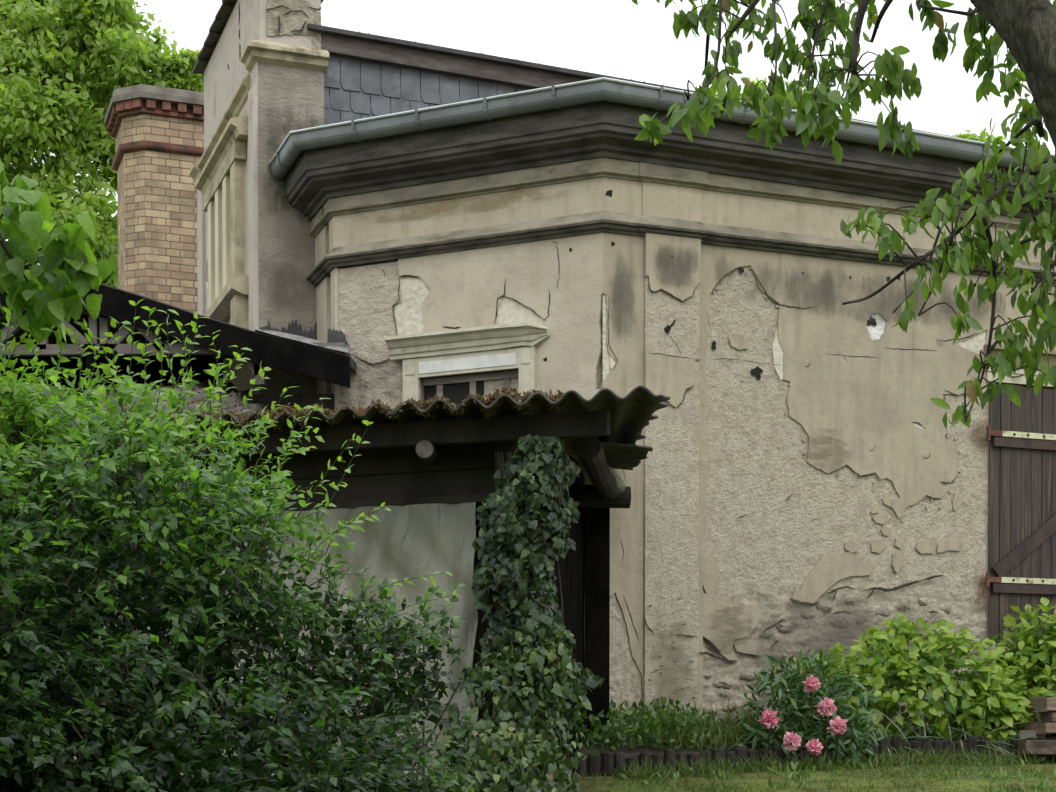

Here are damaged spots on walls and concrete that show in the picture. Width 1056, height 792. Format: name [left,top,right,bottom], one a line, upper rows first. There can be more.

flaking render [266,0,322,36]
flaking render [338,261,431,410]
water stain [658,255,687,284]
flaking render [609,266,988,731]